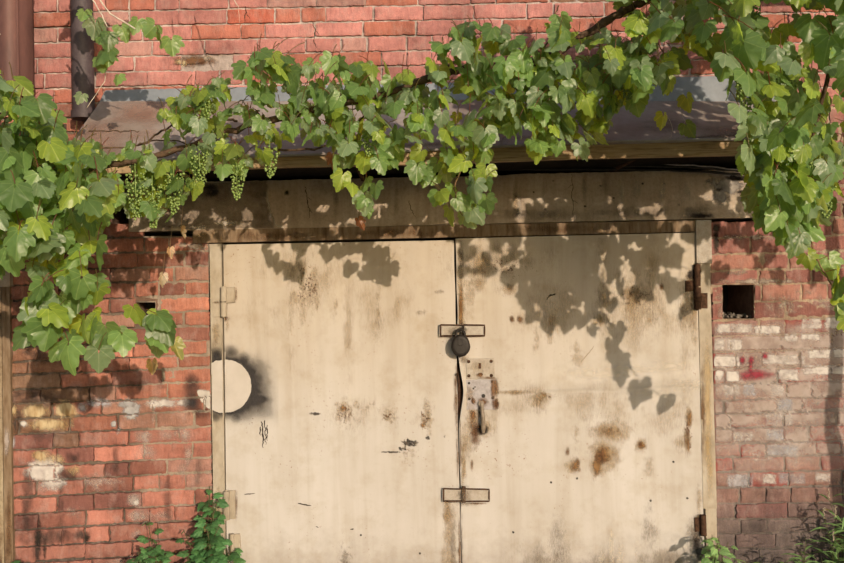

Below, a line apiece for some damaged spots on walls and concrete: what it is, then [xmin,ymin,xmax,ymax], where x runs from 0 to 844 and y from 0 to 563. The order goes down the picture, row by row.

damp [12,403,76,430]
damp [149,399,187,407]
corrosion [457,367,498,477]
corrosion [592,425,624,473]
damp [27,451,78,490]